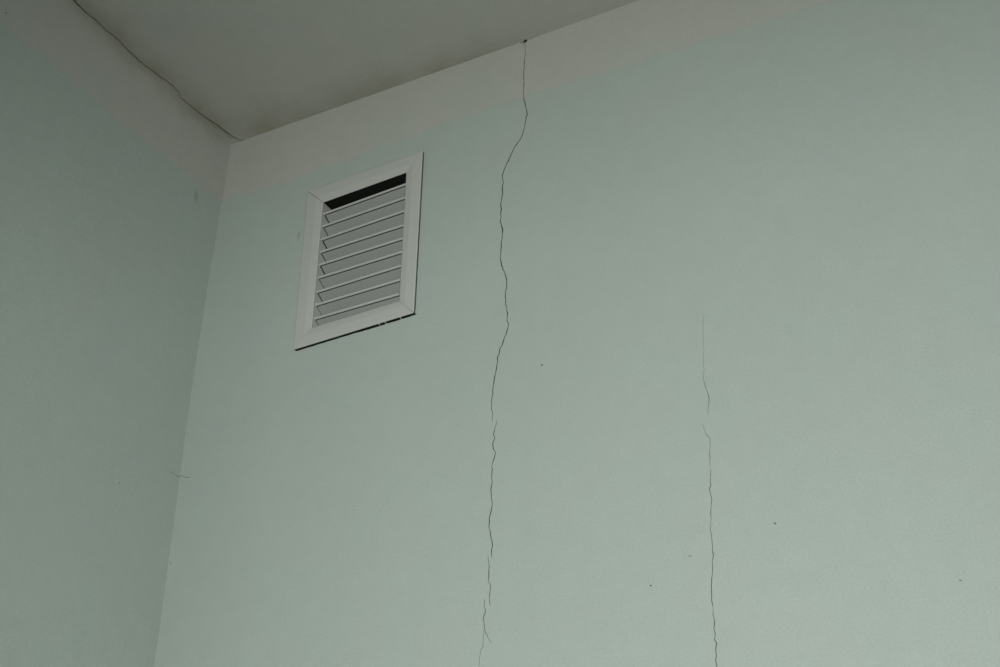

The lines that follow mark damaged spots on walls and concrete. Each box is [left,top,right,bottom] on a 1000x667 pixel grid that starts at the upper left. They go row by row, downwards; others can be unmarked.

crack [73,0,243,141]
crack [479,42,528,665]
crack [703,316,717,666]